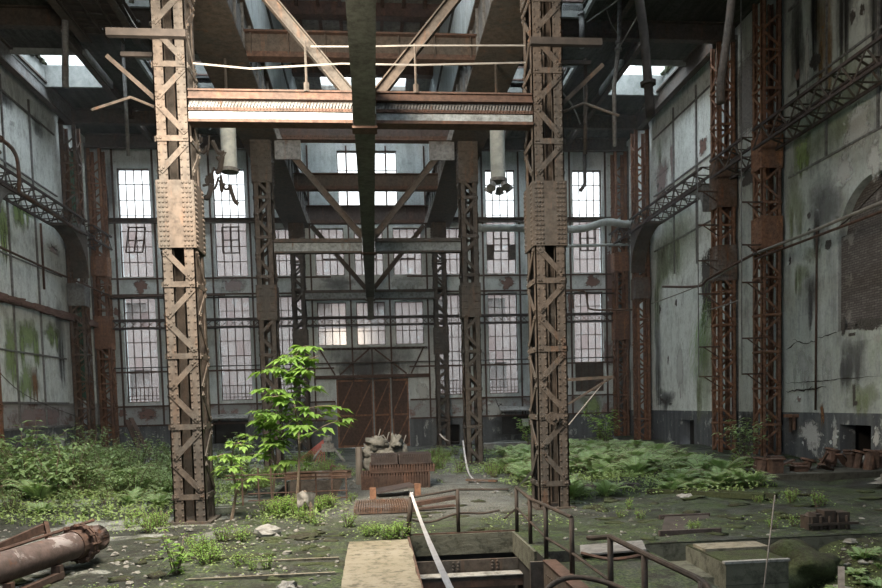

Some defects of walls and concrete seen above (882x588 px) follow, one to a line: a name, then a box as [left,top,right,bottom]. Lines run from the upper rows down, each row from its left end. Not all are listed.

leakage [839,0,851,63]
leakage [50,318,64,378]
crack [788,332,837,349]
spalling [841,317,882,336]
leakage [841,345,863,386]
crack [786,376,874,393]
peeling [799,420,839,451]